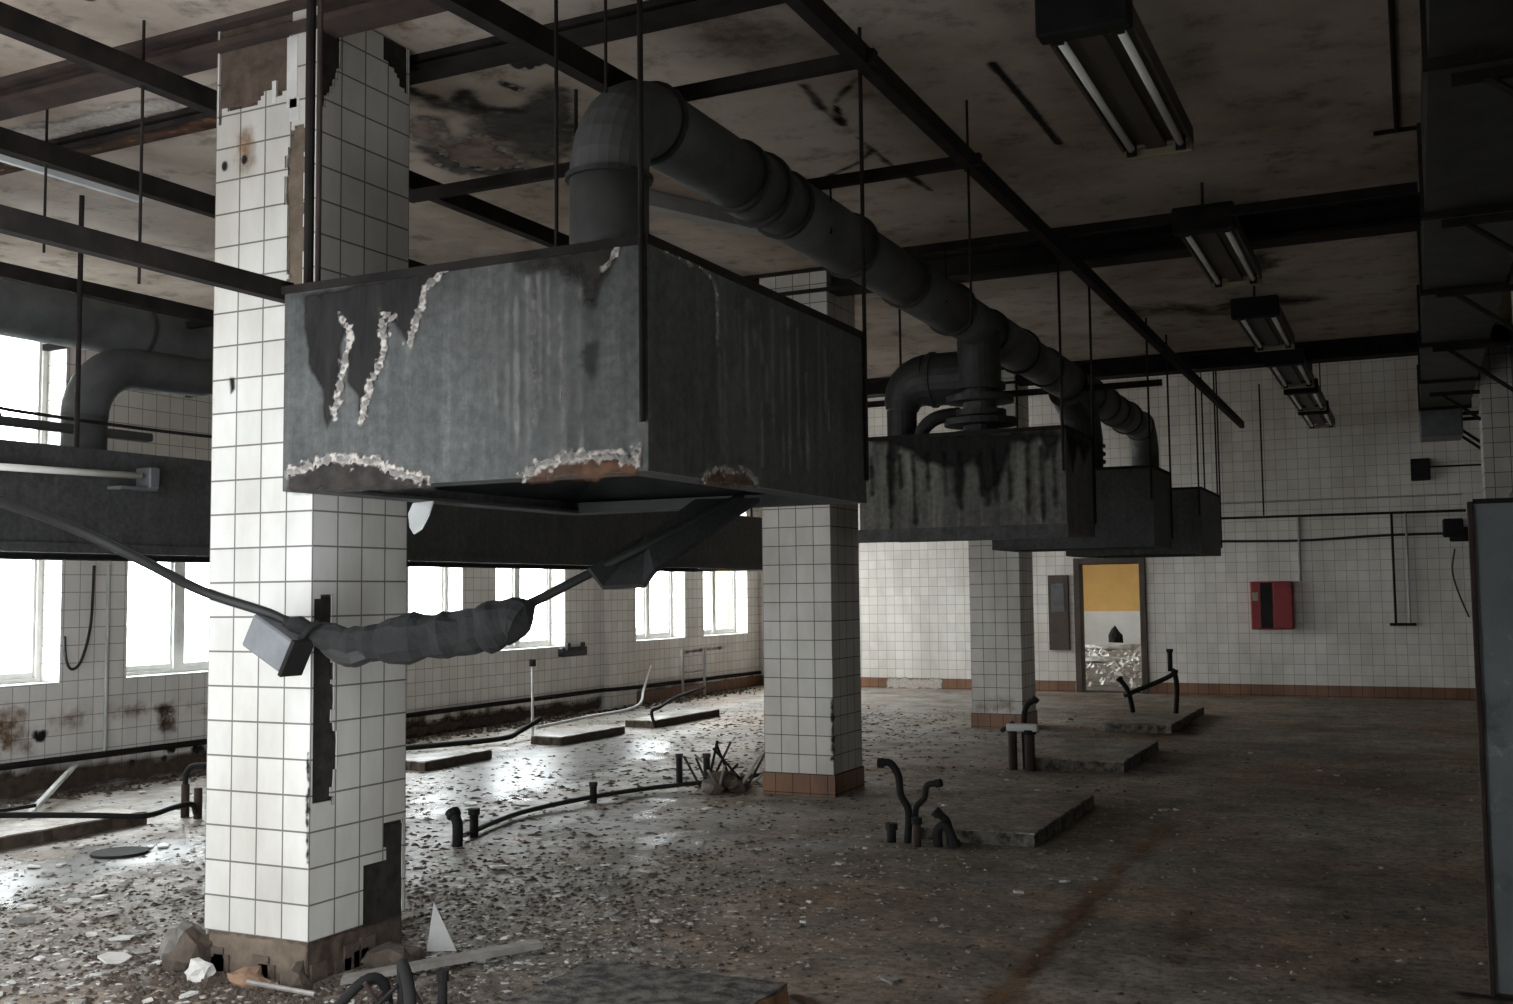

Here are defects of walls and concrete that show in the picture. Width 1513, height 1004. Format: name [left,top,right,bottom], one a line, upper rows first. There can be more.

peeling [12,97,178,141]
leakage [410,87,574,162]
peeling [209,14,448,426]
leakage [869,432,1091,529]
peeling [314,596,331,623]
peeling [306,646,336,863]
peeling [208,820,402,980]